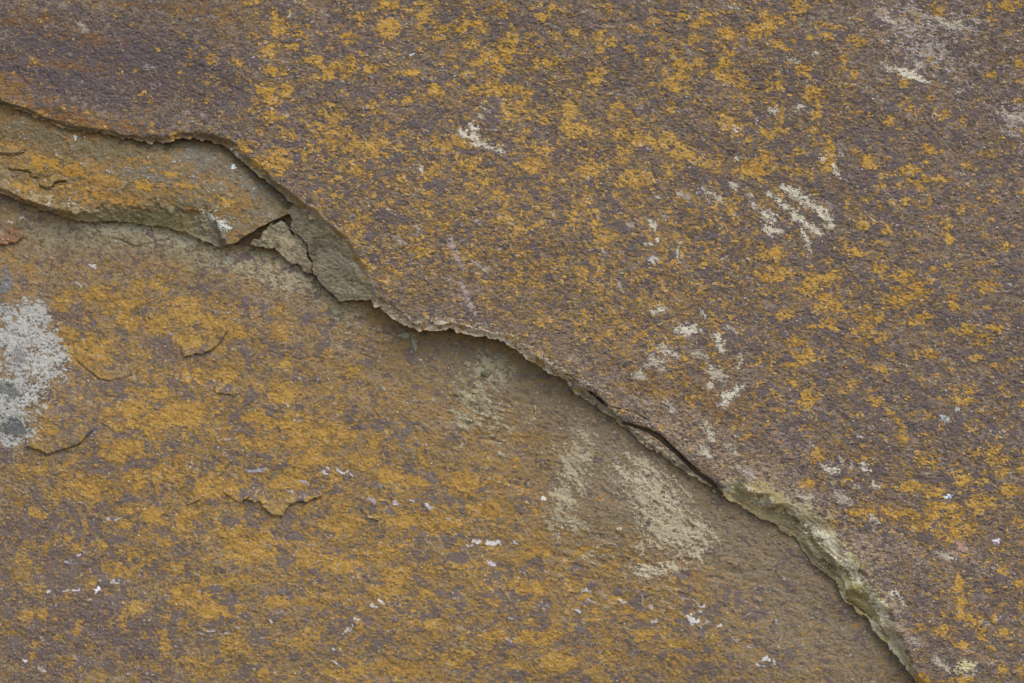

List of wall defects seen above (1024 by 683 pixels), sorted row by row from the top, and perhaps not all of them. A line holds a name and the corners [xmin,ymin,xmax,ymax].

spalling [0,98,917,679]
crack [564,373,717,487]